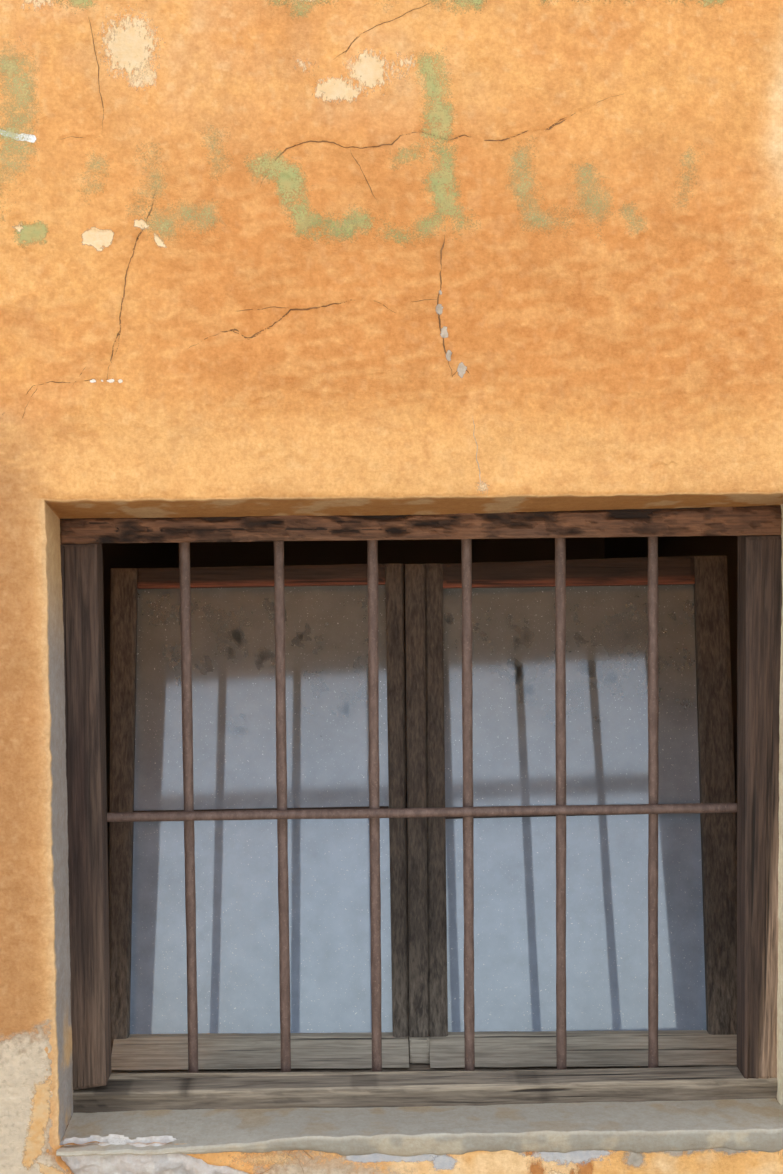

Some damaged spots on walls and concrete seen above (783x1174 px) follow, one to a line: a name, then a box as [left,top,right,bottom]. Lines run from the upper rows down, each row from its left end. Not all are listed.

crack [259,115,572,199]
crack [22,182,160,418]
crack [189,303,341,348]
crack [378,238,469,378]
peeling [0,1020,394,1174]